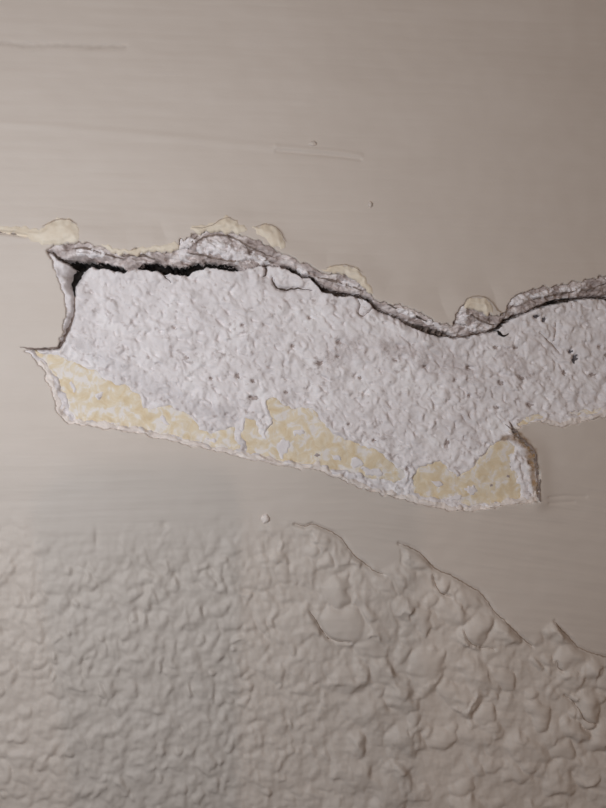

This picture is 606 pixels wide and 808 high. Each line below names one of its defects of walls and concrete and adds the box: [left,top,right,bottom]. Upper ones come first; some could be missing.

spalling [0,215,606,511]
crack [20,234,606,350]